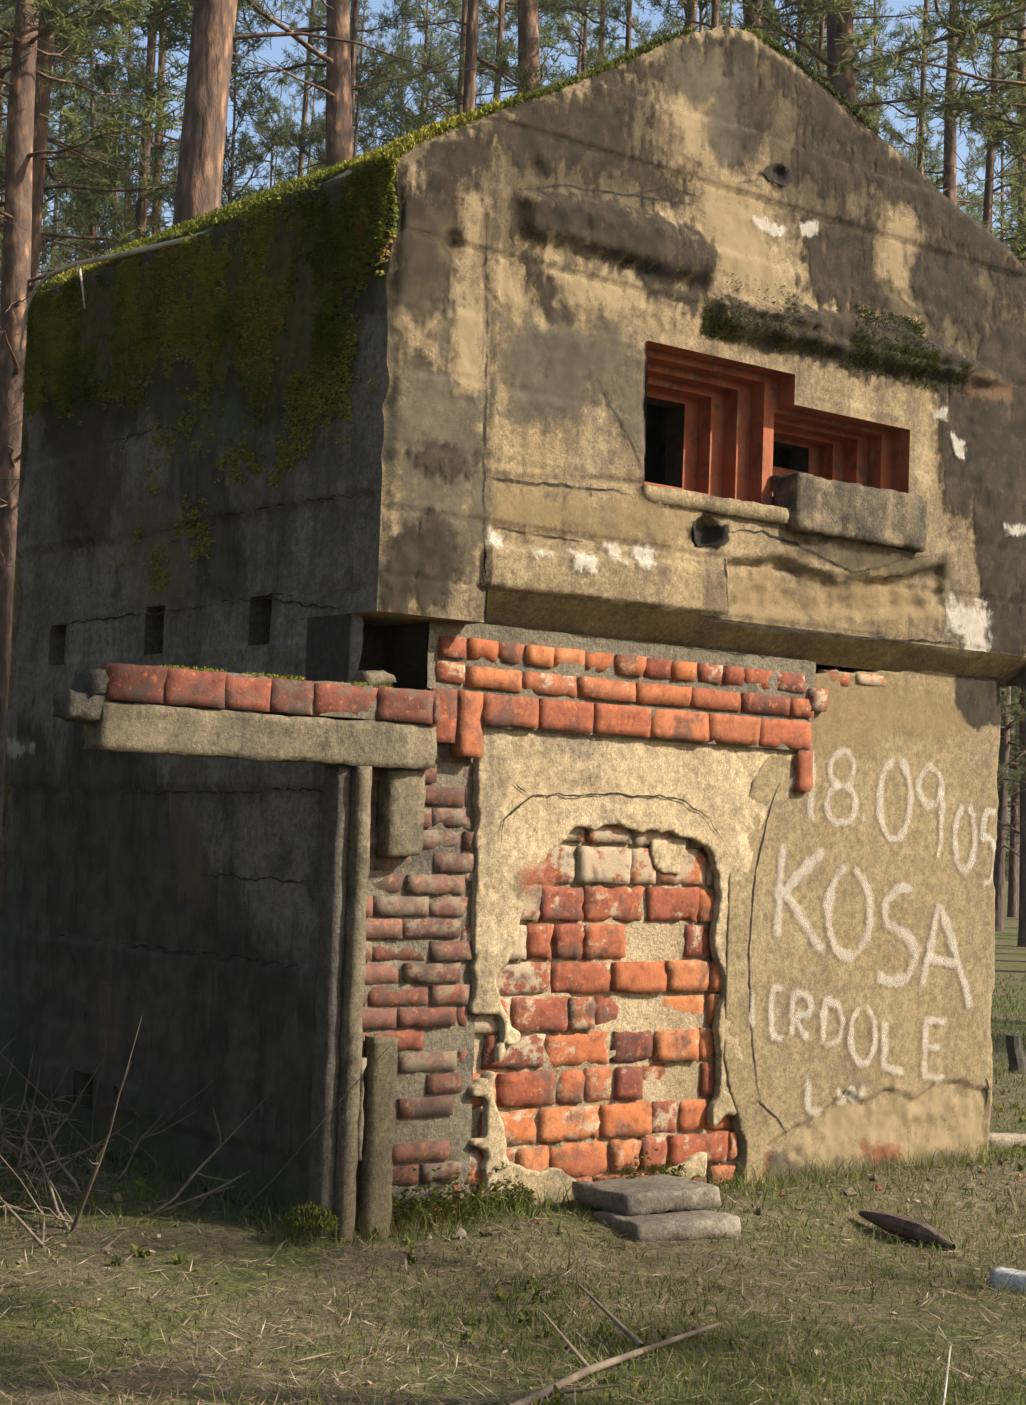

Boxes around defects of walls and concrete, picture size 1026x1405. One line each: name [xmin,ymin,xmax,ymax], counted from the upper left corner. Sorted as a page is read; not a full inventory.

damp [42,25,1026,657]
crack [56,588,355,626]
crack [705,529,964,643]
crack [196,873,316,883]
peeling [650,837,686,875]
crack [498,771,788,1137]
peeling [775,1085,984,1175]